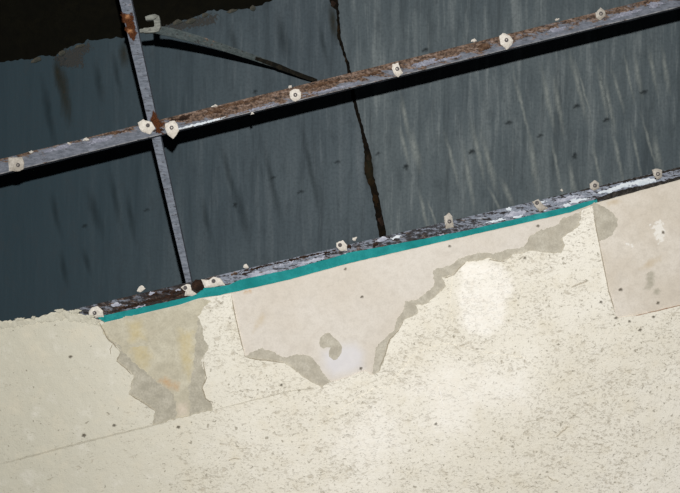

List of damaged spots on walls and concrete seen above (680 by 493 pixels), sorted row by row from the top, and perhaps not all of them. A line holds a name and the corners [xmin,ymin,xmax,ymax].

corrosion [121,13,137,41]
corrosion [150,110,164,134]
corrosion [364,155,378,207]
corrosion [594,167,680,201]
peeling [230,178,680,387]
peeling [0,288,213,425]